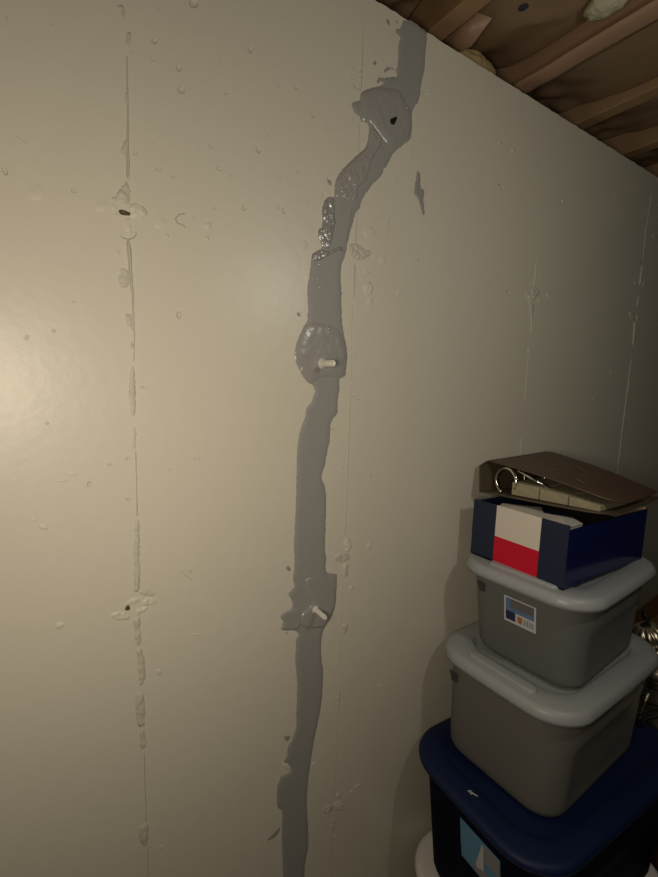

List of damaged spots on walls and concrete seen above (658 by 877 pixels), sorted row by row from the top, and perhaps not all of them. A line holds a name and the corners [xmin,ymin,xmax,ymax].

crack [124,57,132,180]
crack [121,231,137,361]
crack [132,450,140,516]
crack [277,20,427,877]